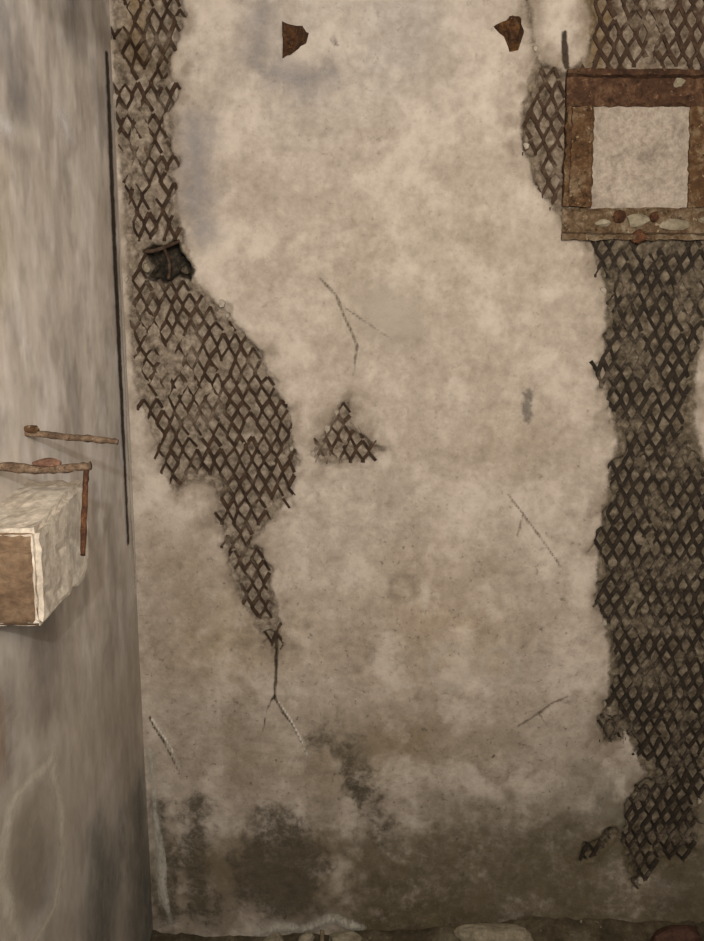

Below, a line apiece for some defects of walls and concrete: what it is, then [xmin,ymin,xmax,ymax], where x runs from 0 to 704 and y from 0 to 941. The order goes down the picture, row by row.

flaking render [521,0,704,221]
flaking render [111,0,297,650]
corrosion [24,425,119,445]
flaking render [311,400,385,464]
flaking render [523,391,532,421]
corrosion [0,458,92,556]
flaking render [578,239,704,889]
crack [264,636,307,754]
damp [309,737,391,831]
damp [137,750,221,941]
damp [228,808,704,937]